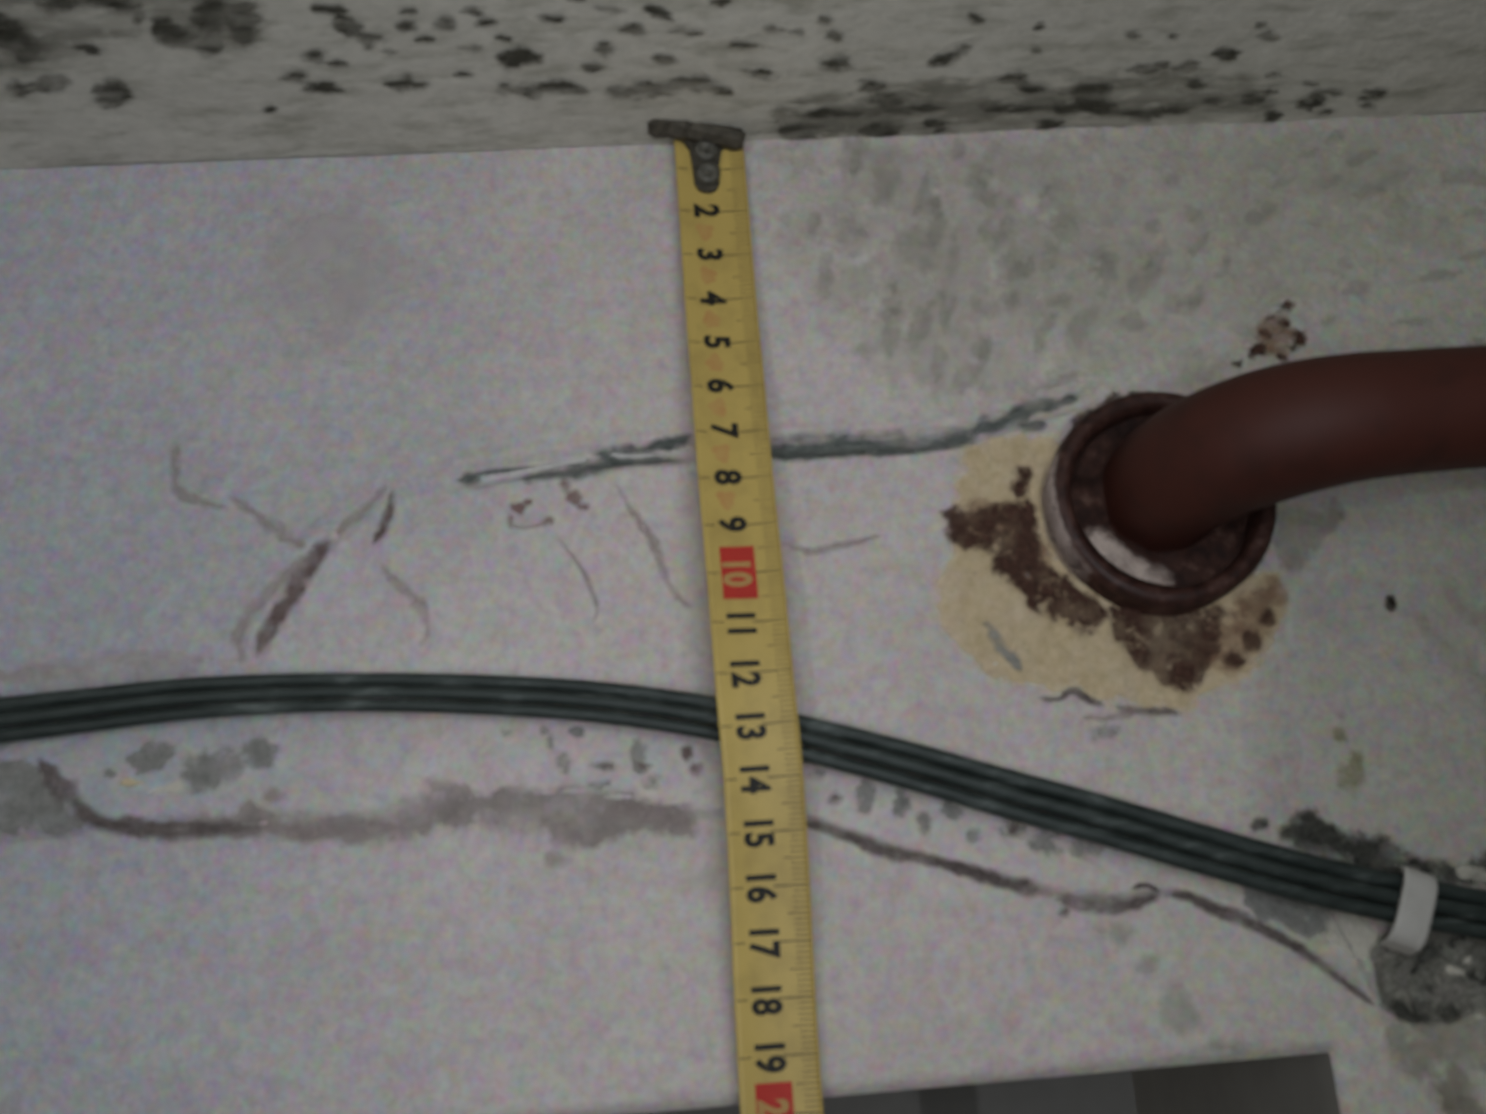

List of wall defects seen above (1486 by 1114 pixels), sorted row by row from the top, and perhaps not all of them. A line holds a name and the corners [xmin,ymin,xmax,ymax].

mould [91,82,132,108]
mould [0,0,260,97]
mould [280,50,347,93]
mould [311,5,672,99]
mould [773,45,1338,139]
corrosion [1232,300,1307,367]
crack [374,497,393,543]
crack [257,542,329,652]
corrosion [943,466,1287,691]
water stain [412,787,693,847]
crack [807,822,1371,1003]
spalling [1244,887,1486,1025]